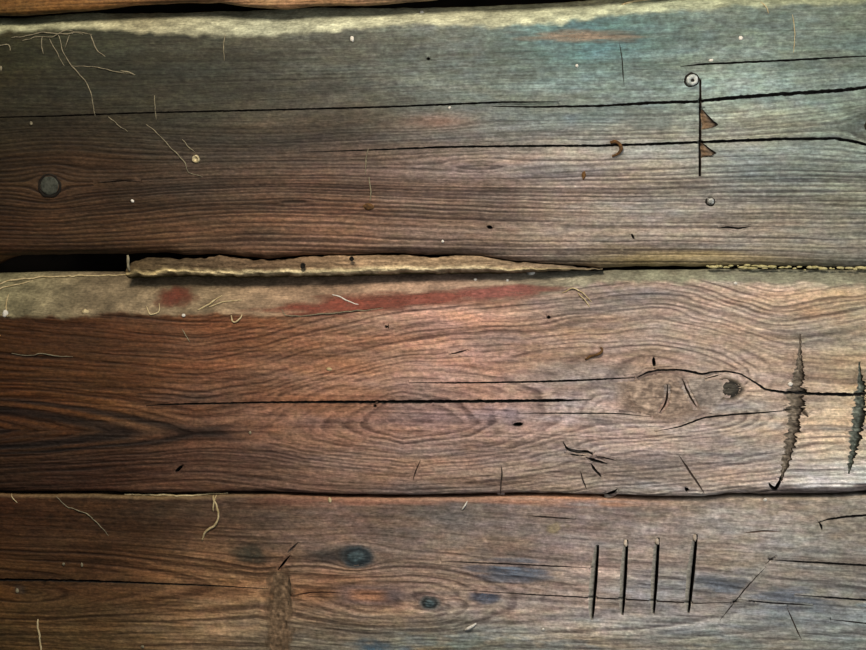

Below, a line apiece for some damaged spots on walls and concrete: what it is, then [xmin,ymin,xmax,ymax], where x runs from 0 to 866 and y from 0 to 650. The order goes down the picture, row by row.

leakage [543,32,625,40]
crack [680,52,866,70]
crack [0,82,866,121]
crack [300,133,866,156]
leakage [366,285,550,306]
crack [146,365,866,435]
crack [441,556,866,627]